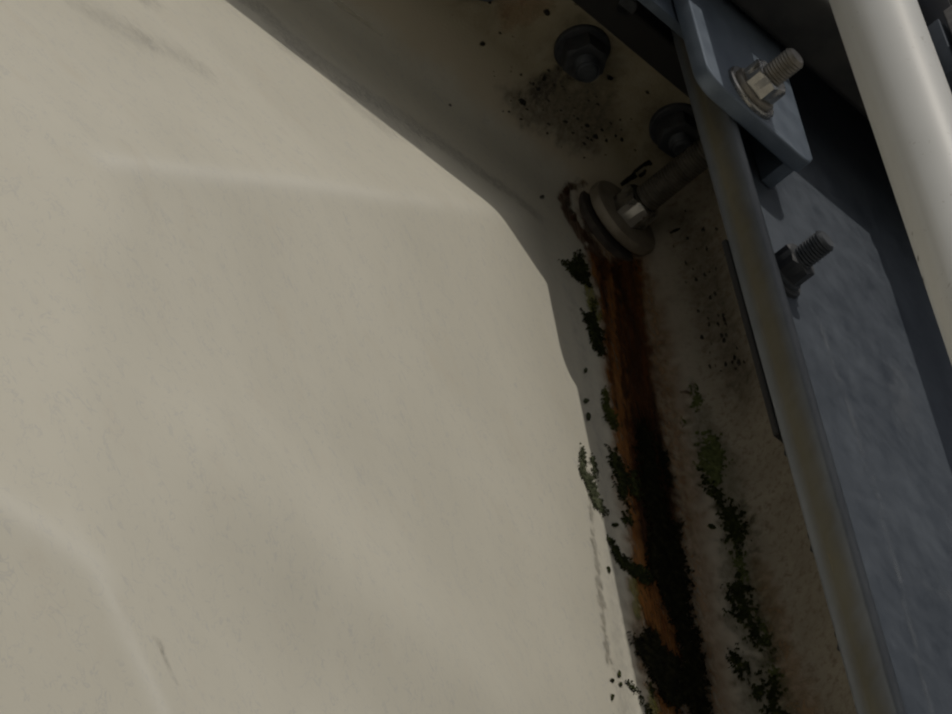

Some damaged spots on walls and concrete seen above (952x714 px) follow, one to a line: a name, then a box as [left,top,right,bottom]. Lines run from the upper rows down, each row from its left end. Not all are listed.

rust [558,180,729,714]